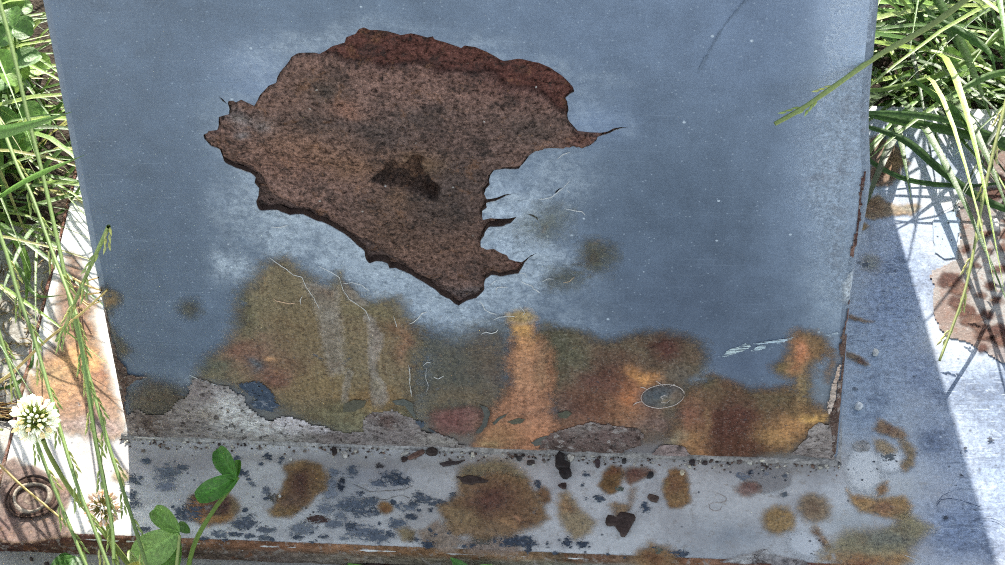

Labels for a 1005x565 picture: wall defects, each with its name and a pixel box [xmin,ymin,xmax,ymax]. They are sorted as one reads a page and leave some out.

peeling [126,378,465,502]
rust [181,257,869,565]
rust [875,420,915,471]
rust [763,481,932,565]